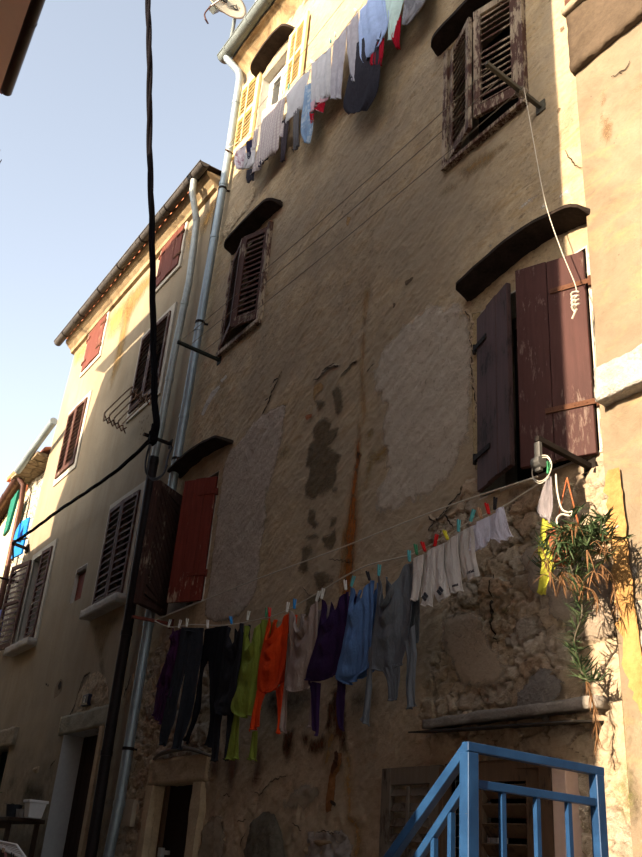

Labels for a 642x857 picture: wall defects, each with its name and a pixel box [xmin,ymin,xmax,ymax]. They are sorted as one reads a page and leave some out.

crack [262,370,283,414]
water stain [299,387,343,616]
rust [341,431,361,595]